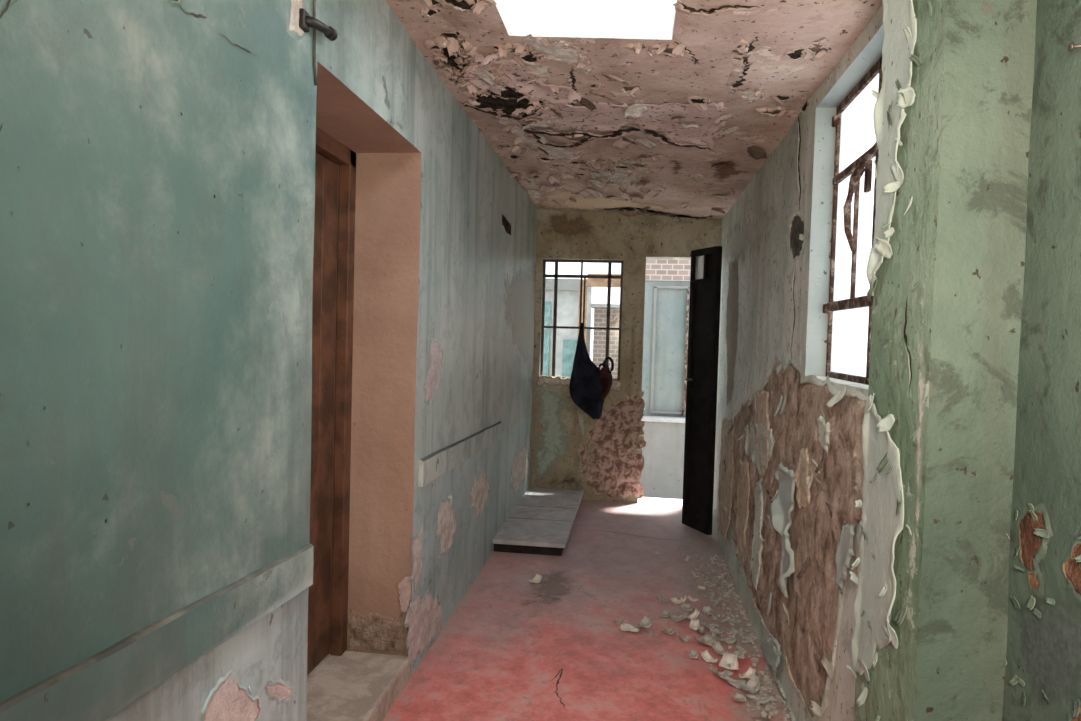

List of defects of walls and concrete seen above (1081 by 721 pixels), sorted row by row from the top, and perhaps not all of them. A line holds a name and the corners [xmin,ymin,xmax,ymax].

crack [0,0,18,19]
crack [669,2,759,94]
flaking render [783,39,832,60]
peeling [415,0,741,212]
crack [510,68,716,152]
flaking render [737,88,794,118]
peeling [866,0,932,298]
flaking render [582,379,647,499]
flaking render [718,357,912,721]
flaking render [1006,503,1055,619]
flaking render [1061,531,1081,602]
flaking render [201,669,295,721]